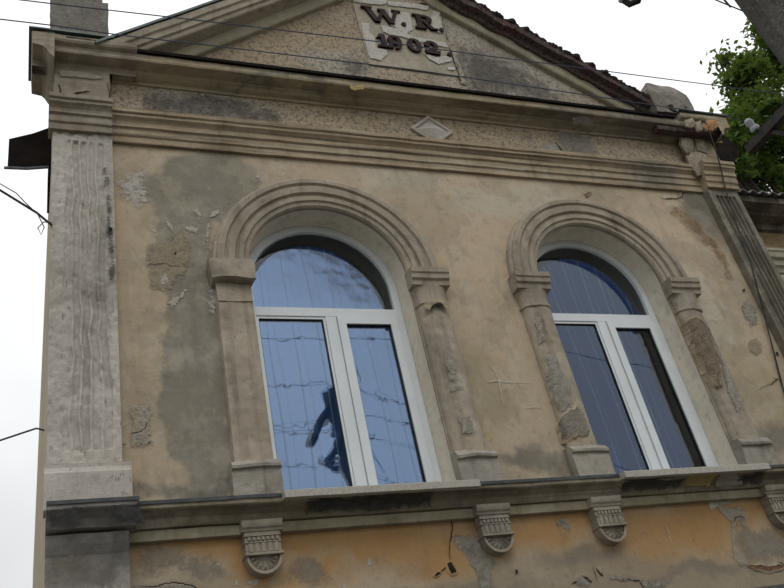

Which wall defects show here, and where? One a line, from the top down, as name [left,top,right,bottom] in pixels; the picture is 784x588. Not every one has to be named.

water stain [172,0,344,56]
water stain [421,0,635,110]
flaking render [652,118,725,177]
flaking render [146,209,219,290]
flaking render [681,316,742,410]
flaking render [555,405,590,445]
crack [136,574,212,588]
flaking render [451,534,495,588]
crack [610,572,666,588]
flaking render [709,501,784,575]